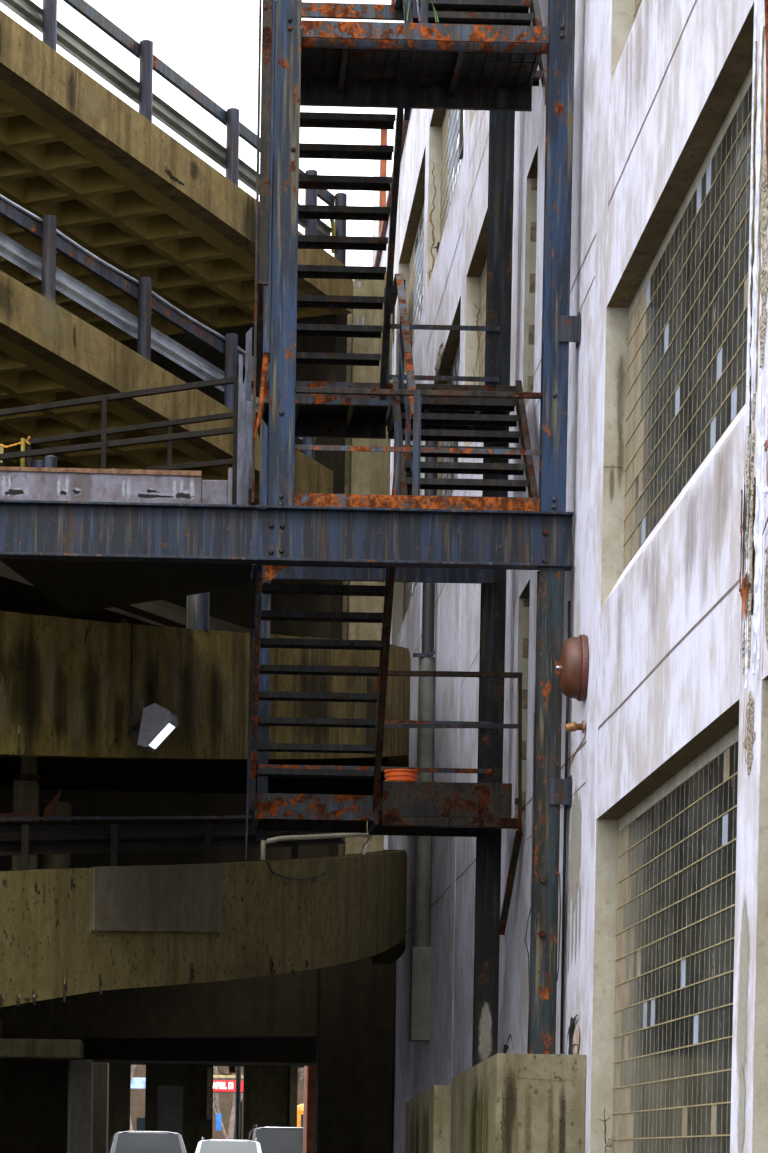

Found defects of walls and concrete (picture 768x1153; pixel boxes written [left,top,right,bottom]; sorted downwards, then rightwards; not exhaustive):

rust [254,353,270,438]
leakage [0,637,232,744]
leakage [469,1085,487,1153]
leakage [505,1081,516,1153]